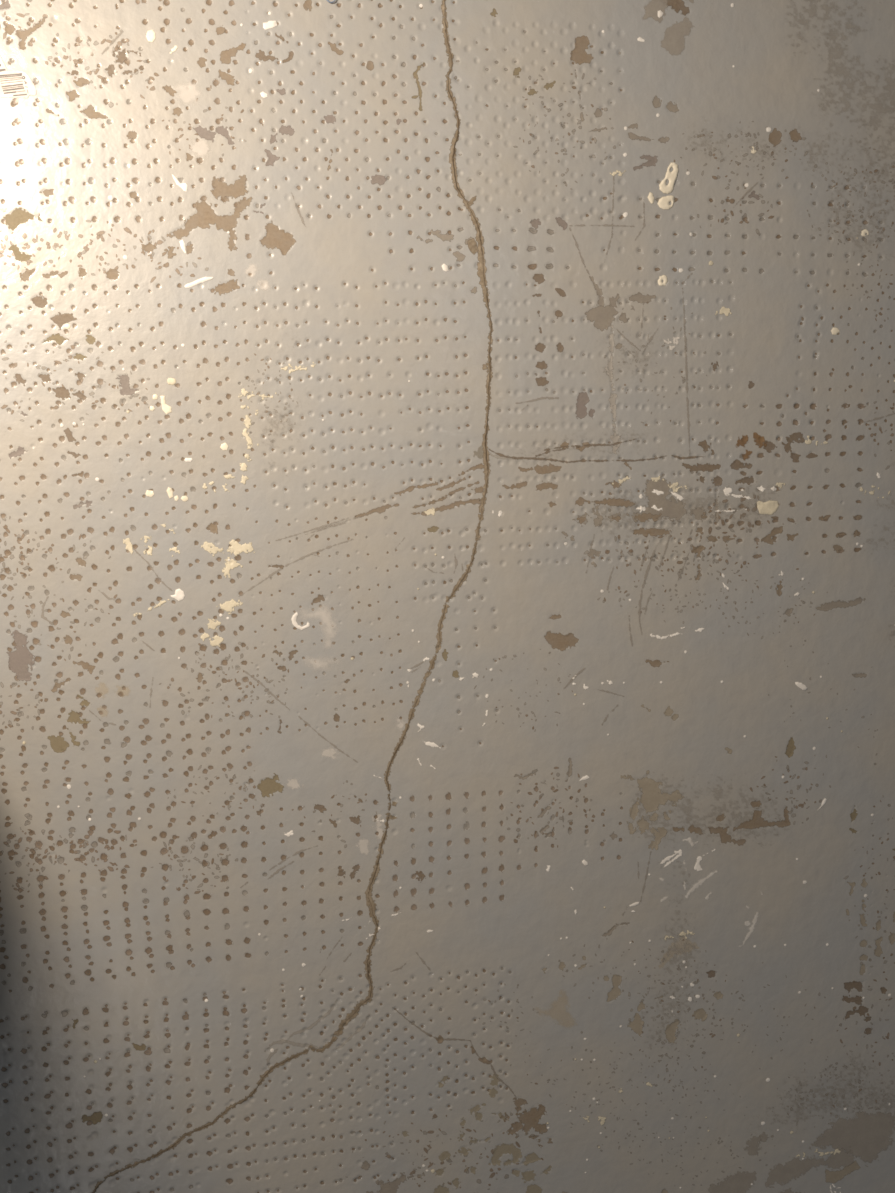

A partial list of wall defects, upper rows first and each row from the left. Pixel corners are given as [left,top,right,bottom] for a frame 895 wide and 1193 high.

peeling [643,0,693,55]
peeling [0,0,463,992]
crack [92,0,701,1193]
peeling [0,796,895,1193]
peeling [474,614,579,732]
peeling [499,464,574,507]
peeling [393,738,831,912]
peeling [555,121,895,639]